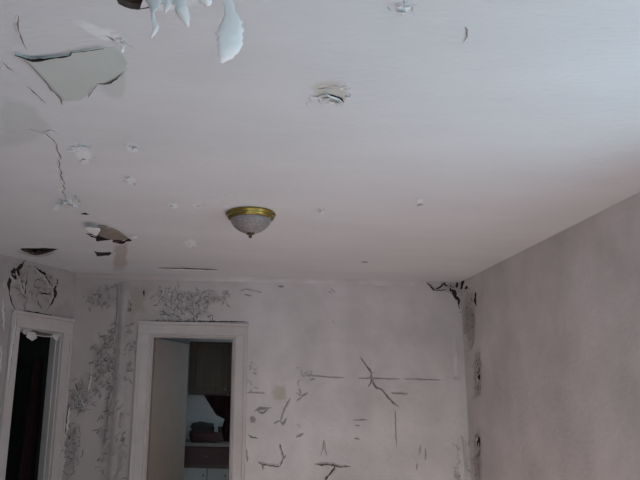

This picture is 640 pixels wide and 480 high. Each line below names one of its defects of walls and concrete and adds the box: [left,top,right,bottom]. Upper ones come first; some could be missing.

peeling [140,0,175,14]
spalling [305,77,352,109]
crack [29,129,66,198]
crack [160,265,218,273]
crack [426,281,476,309]
crack [0,260,69,385]
crack [247,357,439,446]
crack [61,366,92,478]
crack [246,435,286,470]
crack [314,440,351,480]